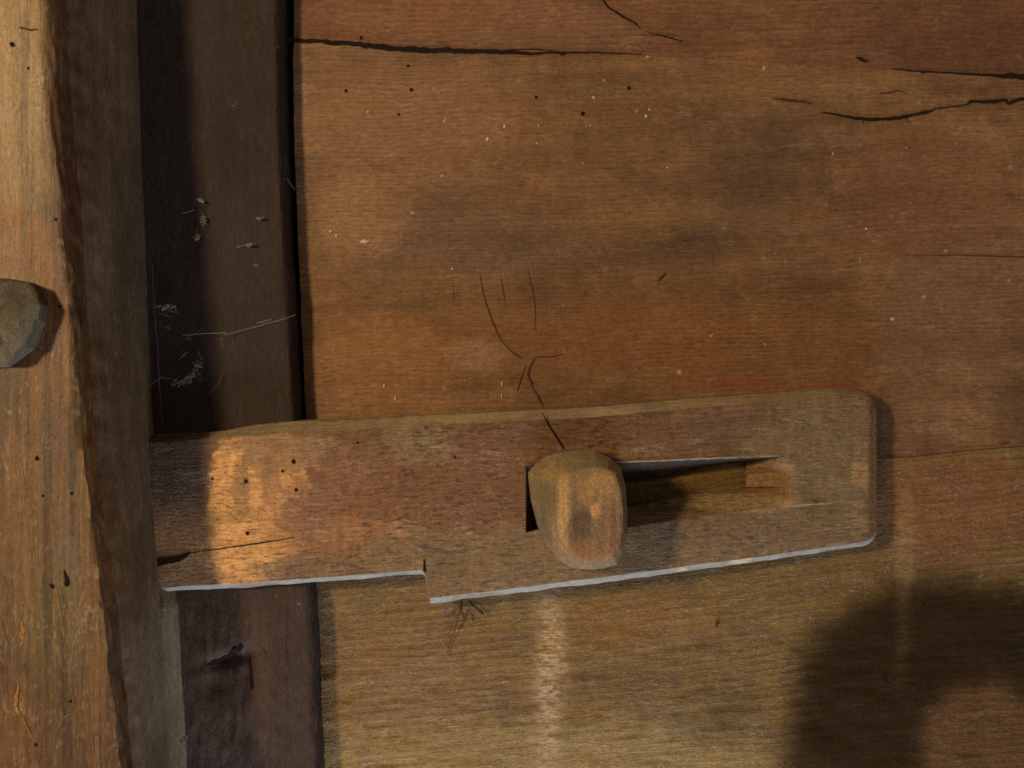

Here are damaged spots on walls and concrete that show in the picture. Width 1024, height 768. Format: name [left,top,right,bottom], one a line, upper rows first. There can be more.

crack [286,0,683,55]
crack [822,68,1024,124]
crack [479,271,522,358]
crack [543,414,564,449]